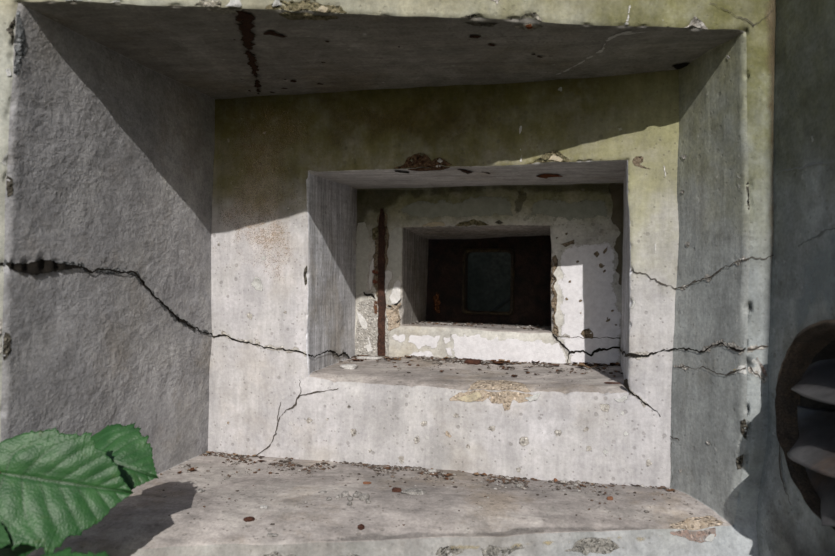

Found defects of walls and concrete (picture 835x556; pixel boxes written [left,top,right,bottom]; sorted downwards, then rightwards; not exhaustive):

spalling [265,0,347,21]
corrosion [233,10,297,94]
spalling [394,153,452,173]
crack [0,259,352,359]
peeling [340,210,621,369]
crack [631,255,774,291]
crack [552,333,768,383]
crack [256,380,339,456]
spalling [449,380,541,411]
crack [624,379,679,483]
spalling [565,538,624,555]
spalling [670,515,724,543]